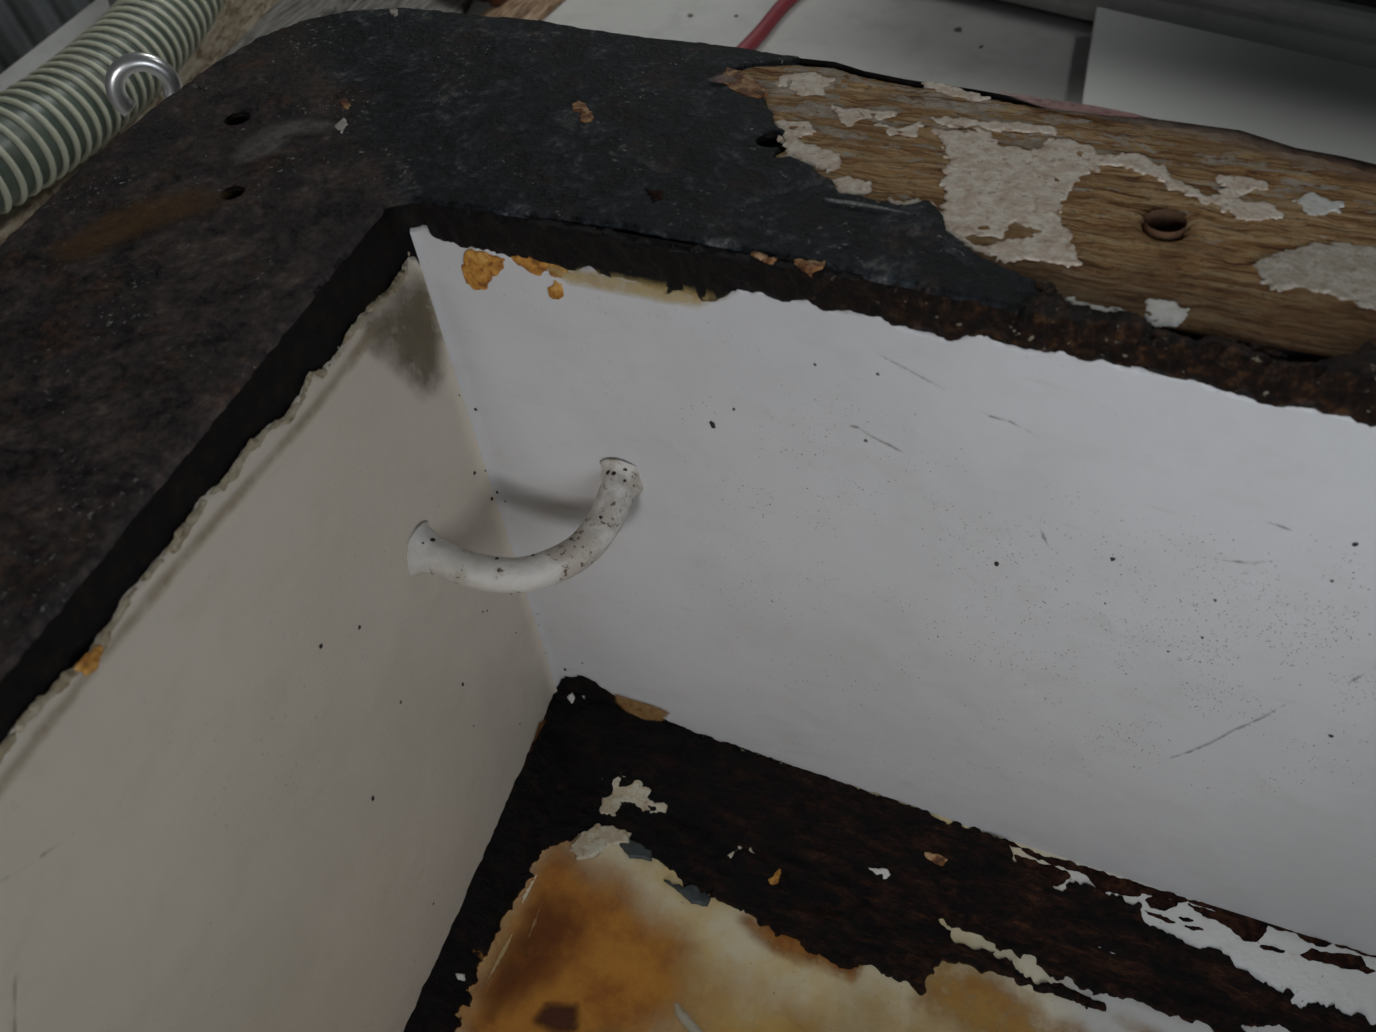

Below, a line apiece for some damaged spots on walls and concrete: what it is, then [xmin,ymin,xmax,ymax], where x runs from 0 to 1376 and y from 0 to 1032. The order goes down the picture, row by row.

rust [710,67,768,98]
peeling [773,72,1344,268]
rust [461,249,569,300]
rust [751,251,777,264]
rust [794,258,826,277]
peeling [1253,242,1376,310]
peeling [1065,296,1127,312]
peeling [1144,298,1190,328]
rust [75,645,103,675]
rust [403,690,1376,1032]
peeling [1003,838,1376,974]
peeling [1051,983,1107,1012]